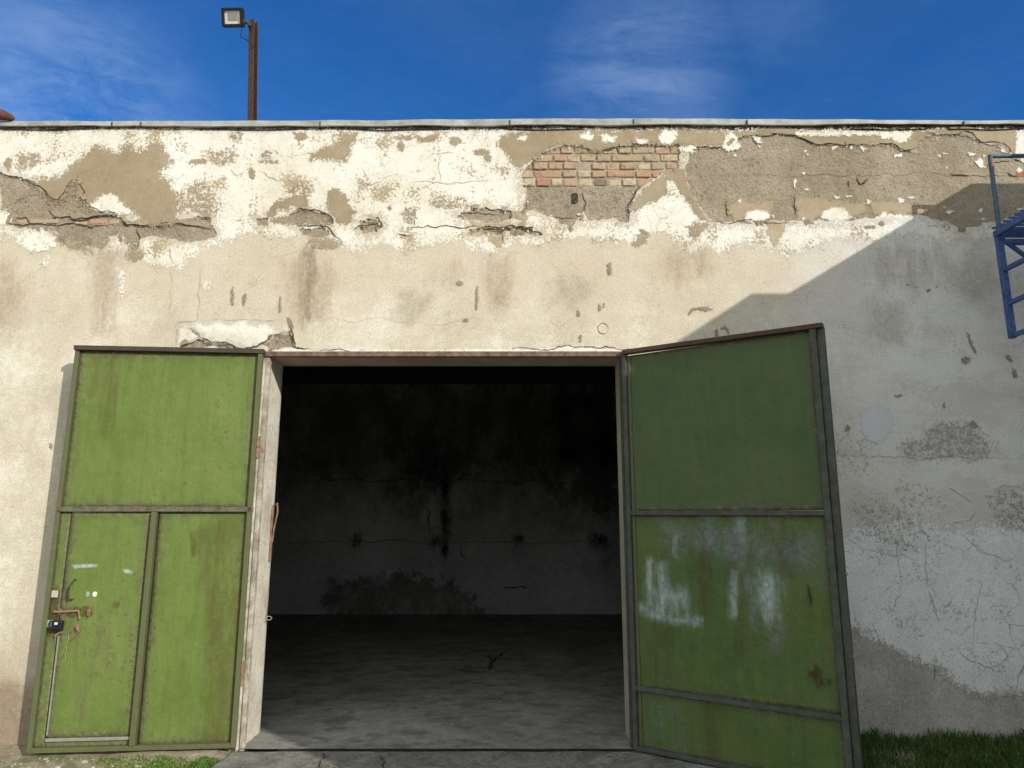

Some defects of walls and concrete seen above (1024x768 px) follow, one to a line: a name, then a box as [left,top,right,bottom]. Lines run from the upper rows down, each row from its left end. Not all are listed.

peeling [0,130,245,299]
flaking render [388,126,1024,249]
crack [564,125,1017,224]
flaking render [178,327,247,349]
flaking render [260,296,295,351]
leakage [320,568,486,615]
crack [844,529,943,619]
crack [948,487,1021,672]